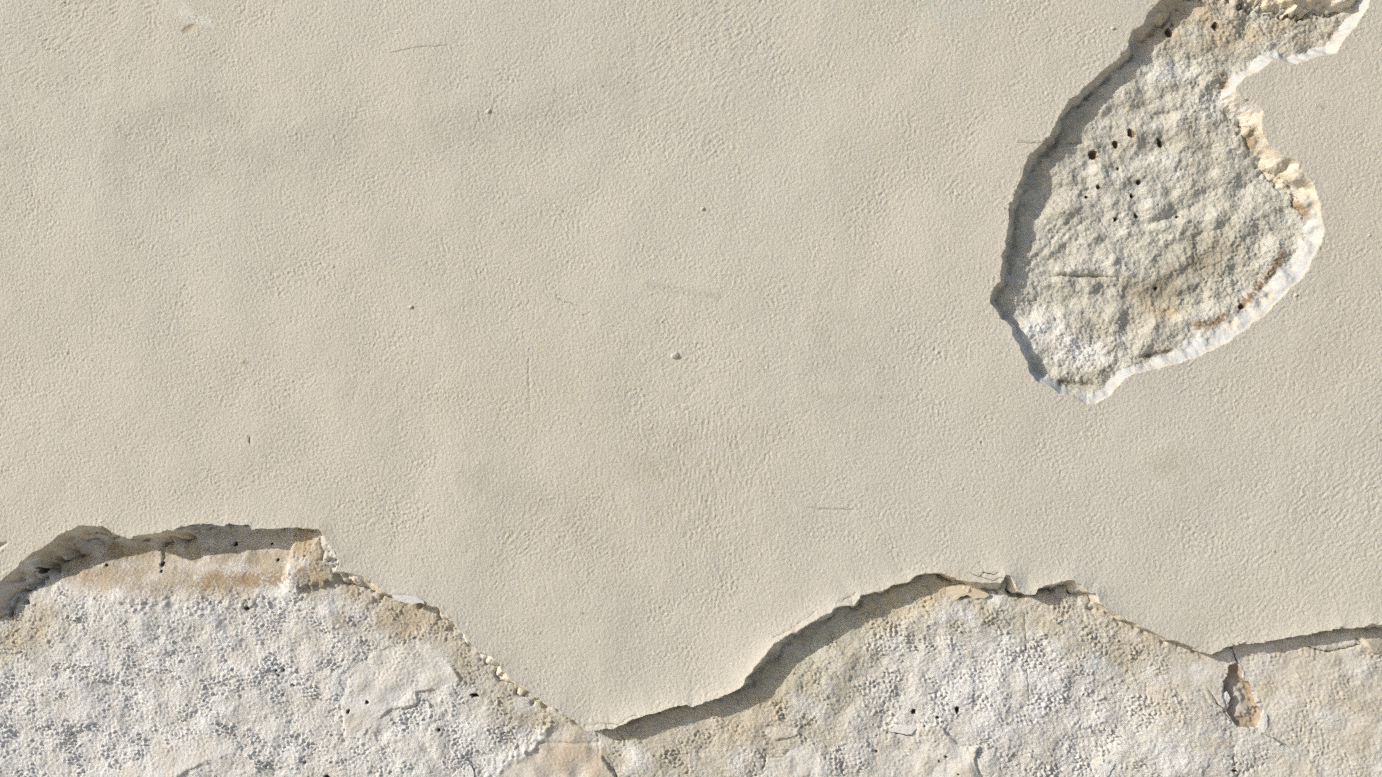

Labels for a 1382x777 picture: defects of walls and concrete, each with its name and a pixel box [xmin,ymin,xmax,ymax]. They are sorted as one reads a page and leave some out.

spalling [1250,0,1370,28]
spalling [990,54,1300,404]
spalling [60,525,110,537]
spalling [144,523,294,561]
spalling [0,562,51,613]
spalling [0,575,1382,777]